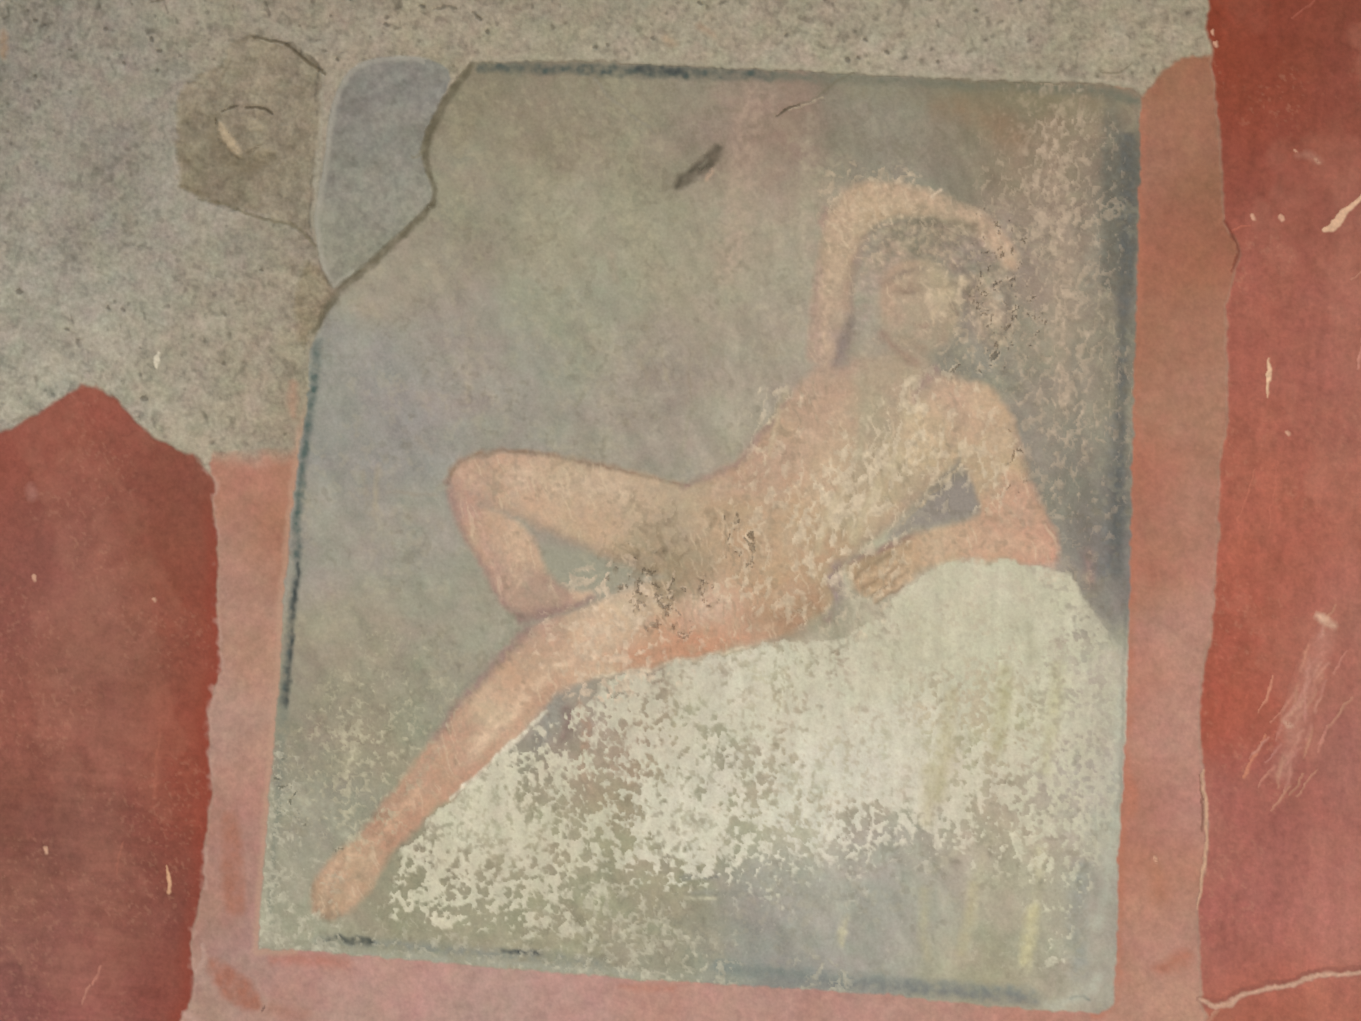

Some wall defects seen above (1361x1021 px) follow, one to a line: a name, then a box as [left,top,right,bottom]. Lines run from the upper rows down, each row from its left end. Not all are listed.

spalling [418,4,492,37]
spalling [173,33,342,352]
peeling [1322,194,1361,233]
spalling [152,351,162,370]
peeling [217,112,1142,994]
crack [1196,964,1361,1021]